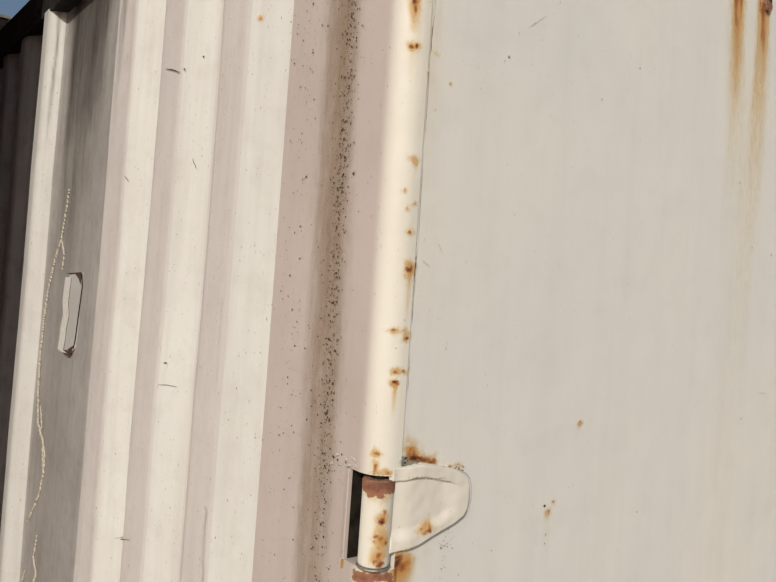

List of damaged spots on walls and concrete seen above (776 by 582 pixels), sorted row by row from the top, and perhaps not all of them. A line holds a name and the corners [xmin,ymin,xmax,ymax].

corrosion [410,0,419,21]
corrosion [733,0,744,82]
corrosion [756,0,770,80]
corrosion [405,261,415,281]
corrosion [390,368,405,392]
corrosion [405,445,436,464]
corrosion [362,450,395,499]
corrosion [419,520,432,534]
corrosion [352,510,412,582]